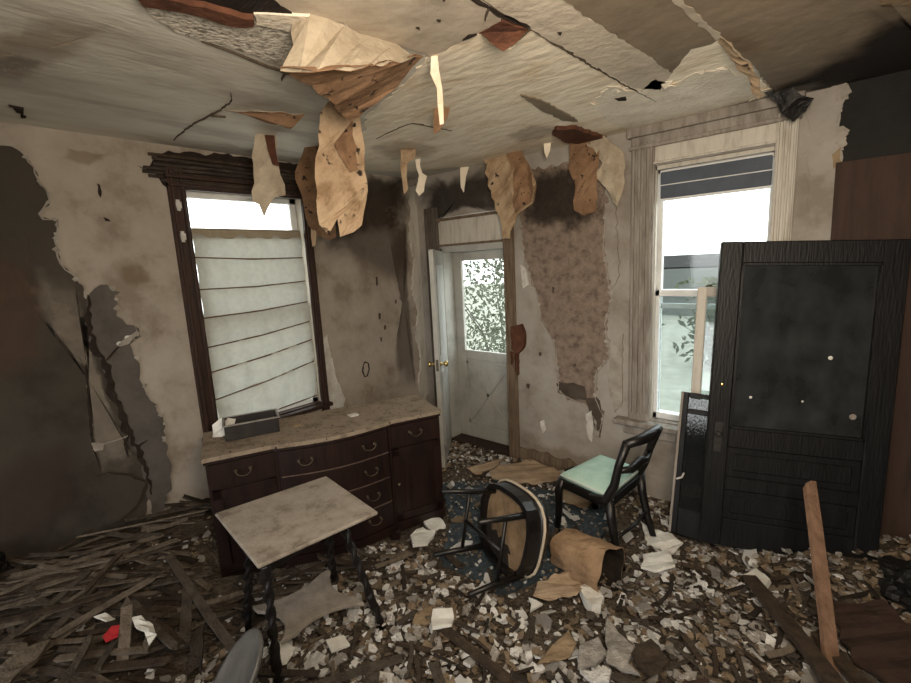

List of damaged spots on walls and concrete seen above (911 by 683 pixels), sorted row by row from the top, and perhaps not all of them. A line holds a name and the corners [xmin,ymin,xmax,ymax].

crack [174,95,232,140]
peeling [145,7,293,66]
crack [201,40,291,81]
peeling [224,109,305,129]
peeling [362,0,852,240]
flaking render [0,143,172,563]
crack [84,295,152,495]
flaking render [519,160,620,444]